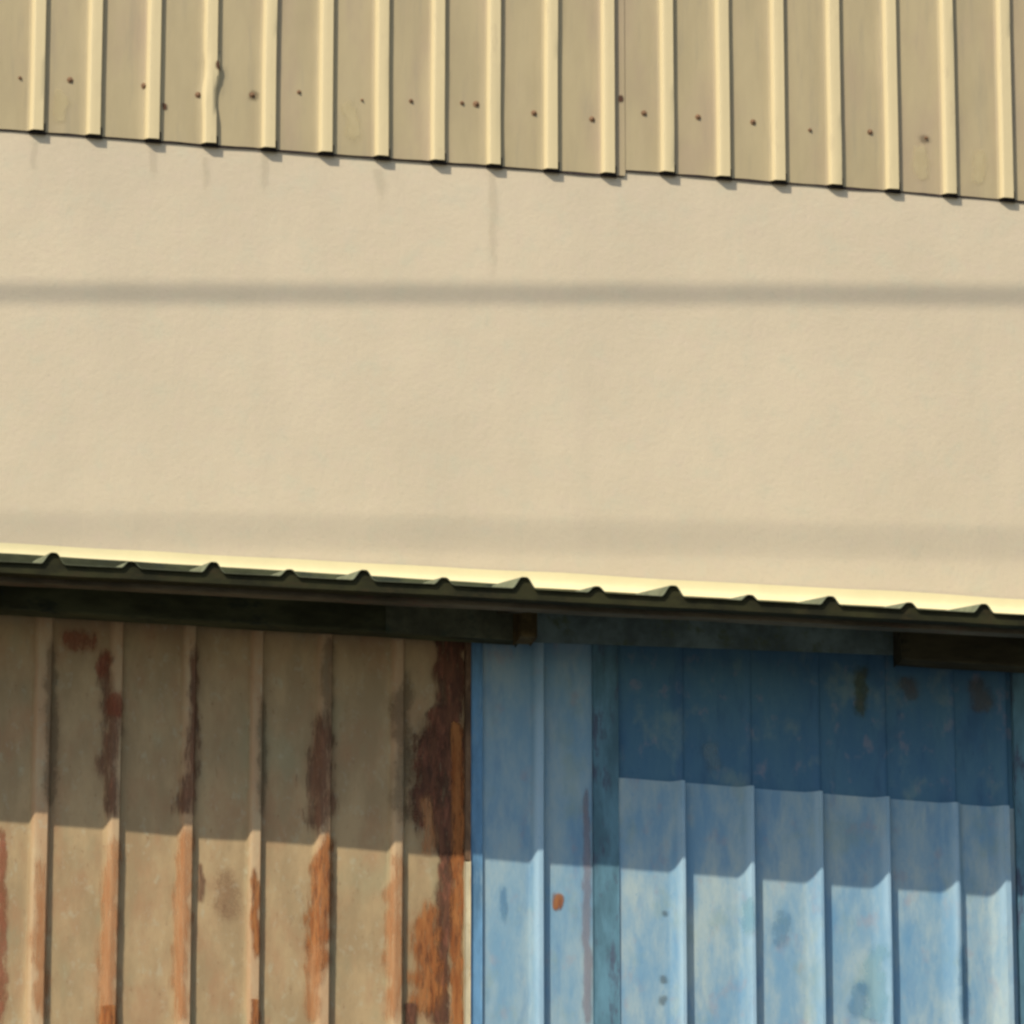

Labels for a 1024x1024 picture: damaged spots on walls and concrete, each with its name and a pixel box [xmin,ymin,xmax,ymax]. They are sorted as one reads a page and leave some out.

corrosion [63,631,124,817]
corrosion [176,649,201,815]
corrosion [96,839,122,1024]
corrosion [171,831,204,1018]
corrosion [250,869,260,957]
corrosion [251,999,261,1024]
corrosion [304,716,337,1022]
corrosion [382,641,465,1024]
corrosion [552,893,564,910]